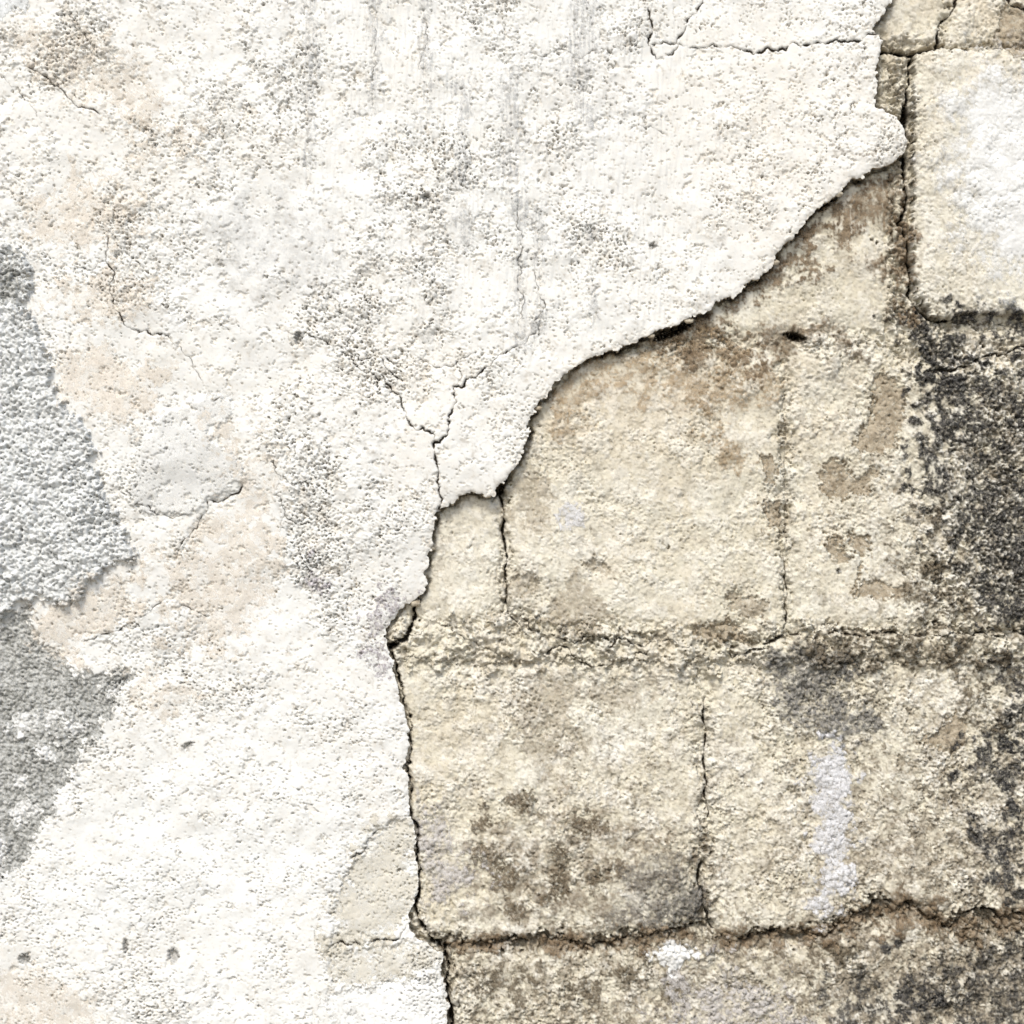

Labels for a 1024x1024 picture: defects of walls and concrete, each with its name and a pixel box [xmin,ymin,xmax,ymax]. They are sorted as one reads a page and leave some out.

crack [630,0,1024,373]
spalling [525,154,903,444]
flaking render [0,241,139,881]
damp [354,582,406,680]
crack [307,333,484,510]
crack [498,492,532,631]
damp [415,173,1024,1024]
crack [547,566,1024,667]
spalling [817,457,880,503]
spalling [824,531,913,601]
spalling [852,369,908,459]
crack [389,606,1021,1024]